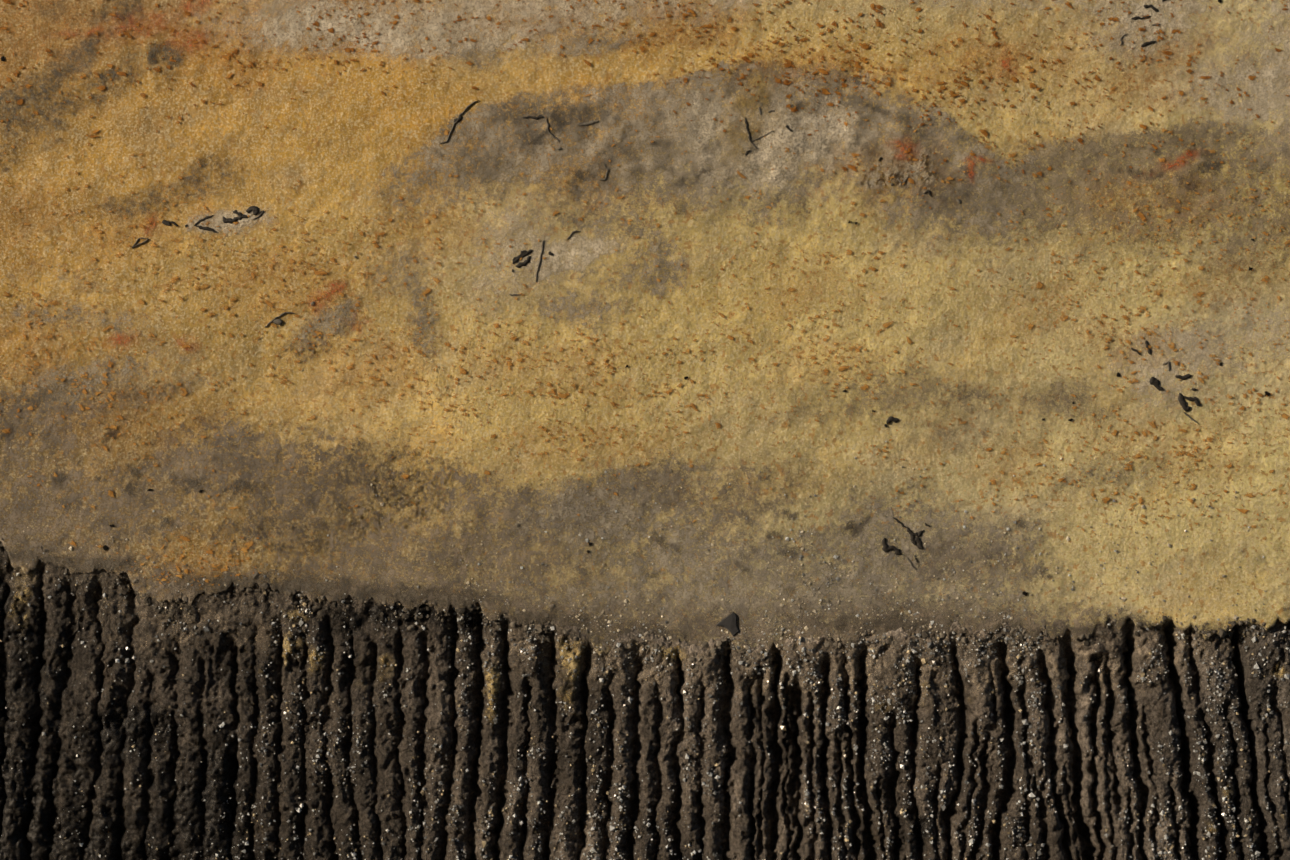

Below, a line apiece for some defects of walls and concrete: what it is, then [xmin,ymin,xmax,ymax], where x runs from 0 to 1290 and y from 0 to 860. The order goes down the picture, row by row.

leakage [376,61,1290,328]
corrosion [0,0,1290,540]
leakage [0,305,1230,706]
peeling [882,517,931,570]
spalling [716,612,739,636]
leakage [485,668,500,721]
spalling [98,711,136,747]